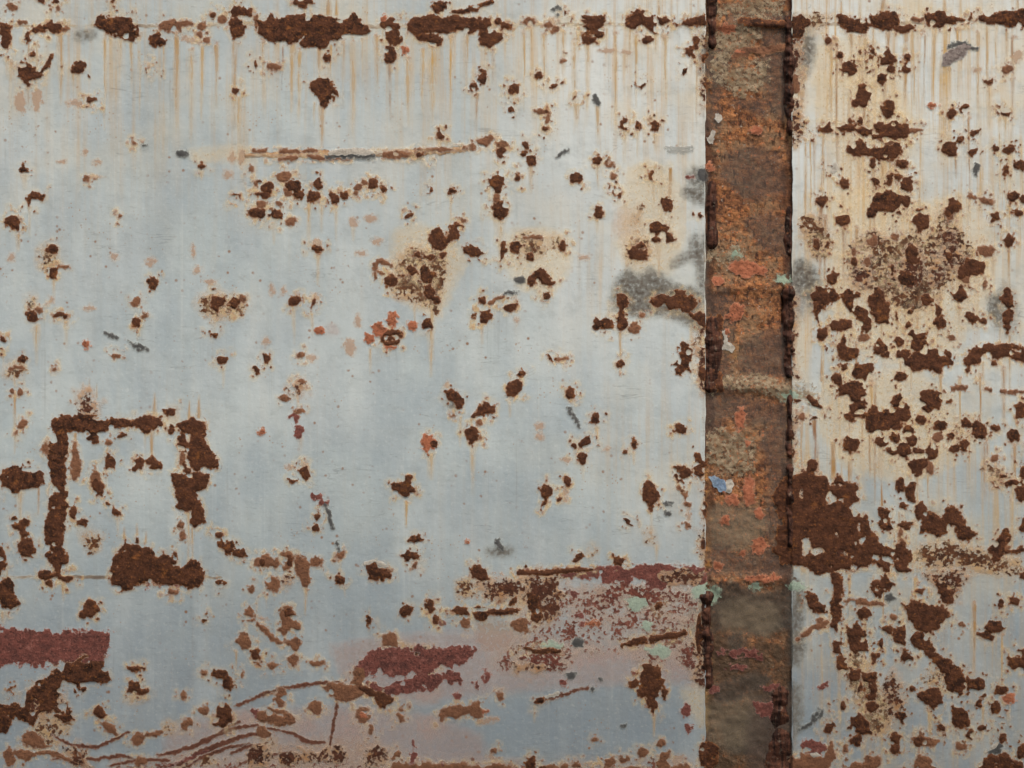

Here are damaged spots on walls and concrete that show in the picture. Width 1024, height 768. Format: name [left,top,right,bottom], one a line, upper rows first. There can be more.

rust [225,150,393,231]
rust [87,0,722,144]
rust [345,103,587,355]
rust [588,0,1024,768]
peeling [344,666,366,687]
rust [0,387,725,768]